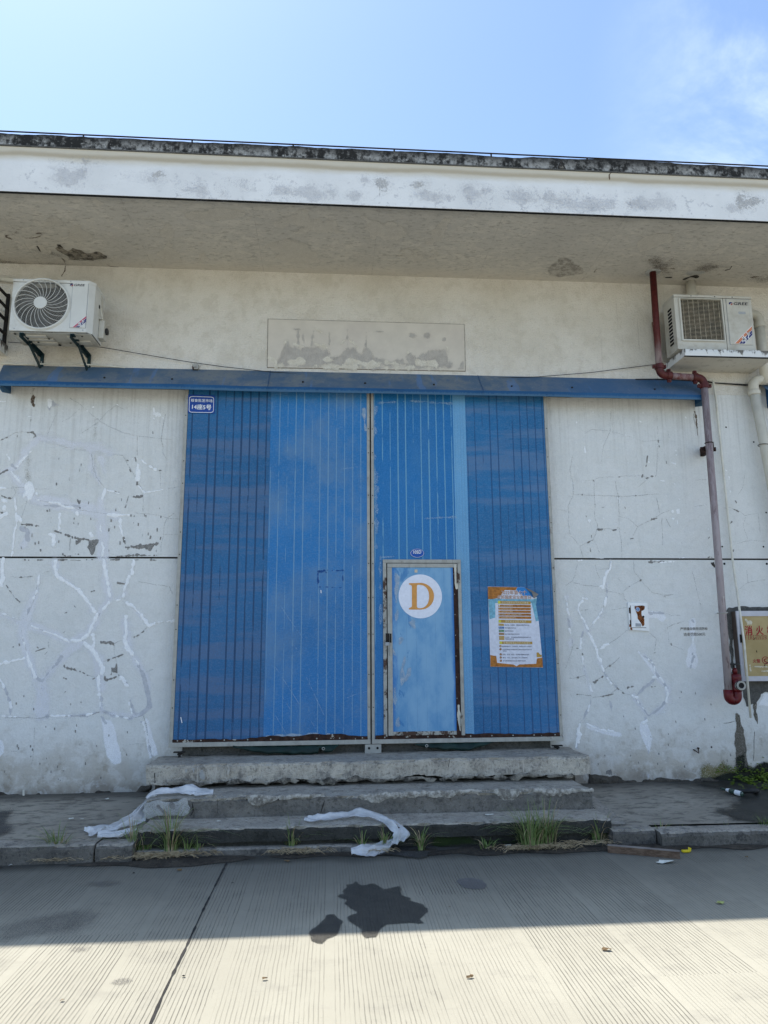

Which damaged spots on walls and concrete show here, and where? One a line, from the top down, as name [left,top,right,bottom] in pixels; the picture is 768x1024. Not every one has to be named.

spalling [35,244,107,262]
peeling [268,328,464,372]
crack [0,398,178,783]
crack [564,413,699,778]
spalling [136,755,719,819]
water stain [699,713,768,822]